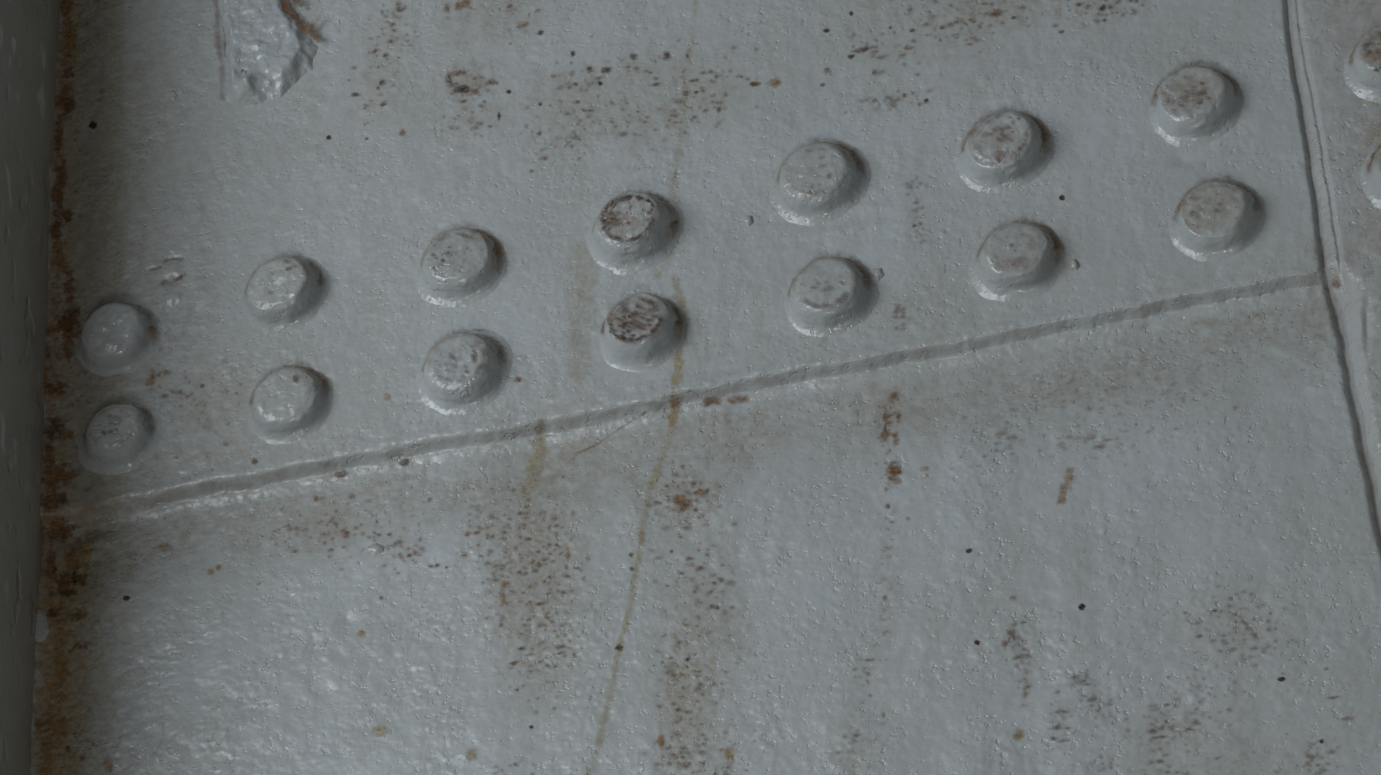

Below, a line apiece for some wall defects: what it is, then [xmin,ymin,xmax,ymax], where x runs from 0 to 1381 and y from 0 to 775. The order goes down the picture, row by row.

rust [601,194,654,241]
rust [607,298,662,342]
rust [31,0,95,775]